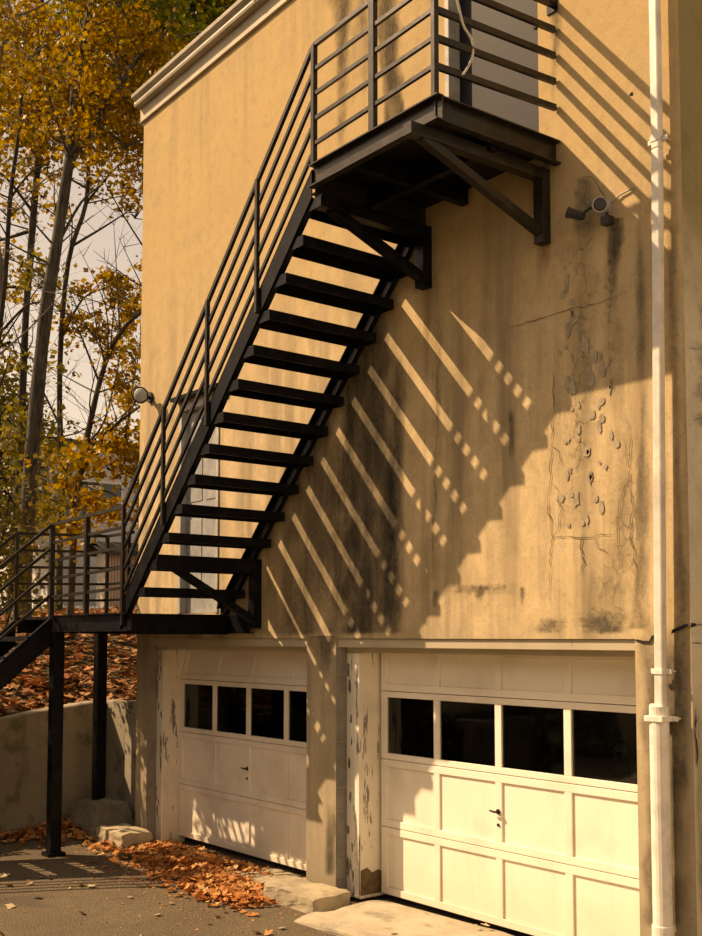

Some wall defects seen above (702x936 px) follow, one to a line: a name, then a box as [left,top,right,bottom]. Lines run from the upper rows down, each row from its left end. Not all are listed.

leakage [382,0,403,120]
leakage [611,218,621,259]
crack [516,292,623,326]
leakage [341,327,399,633]
peeling [564,424,607,485]
crack [547,374,638,607]
leakage [588,616,619,633]
crack [692,717,700,762]
peeling [346,792,382,896]